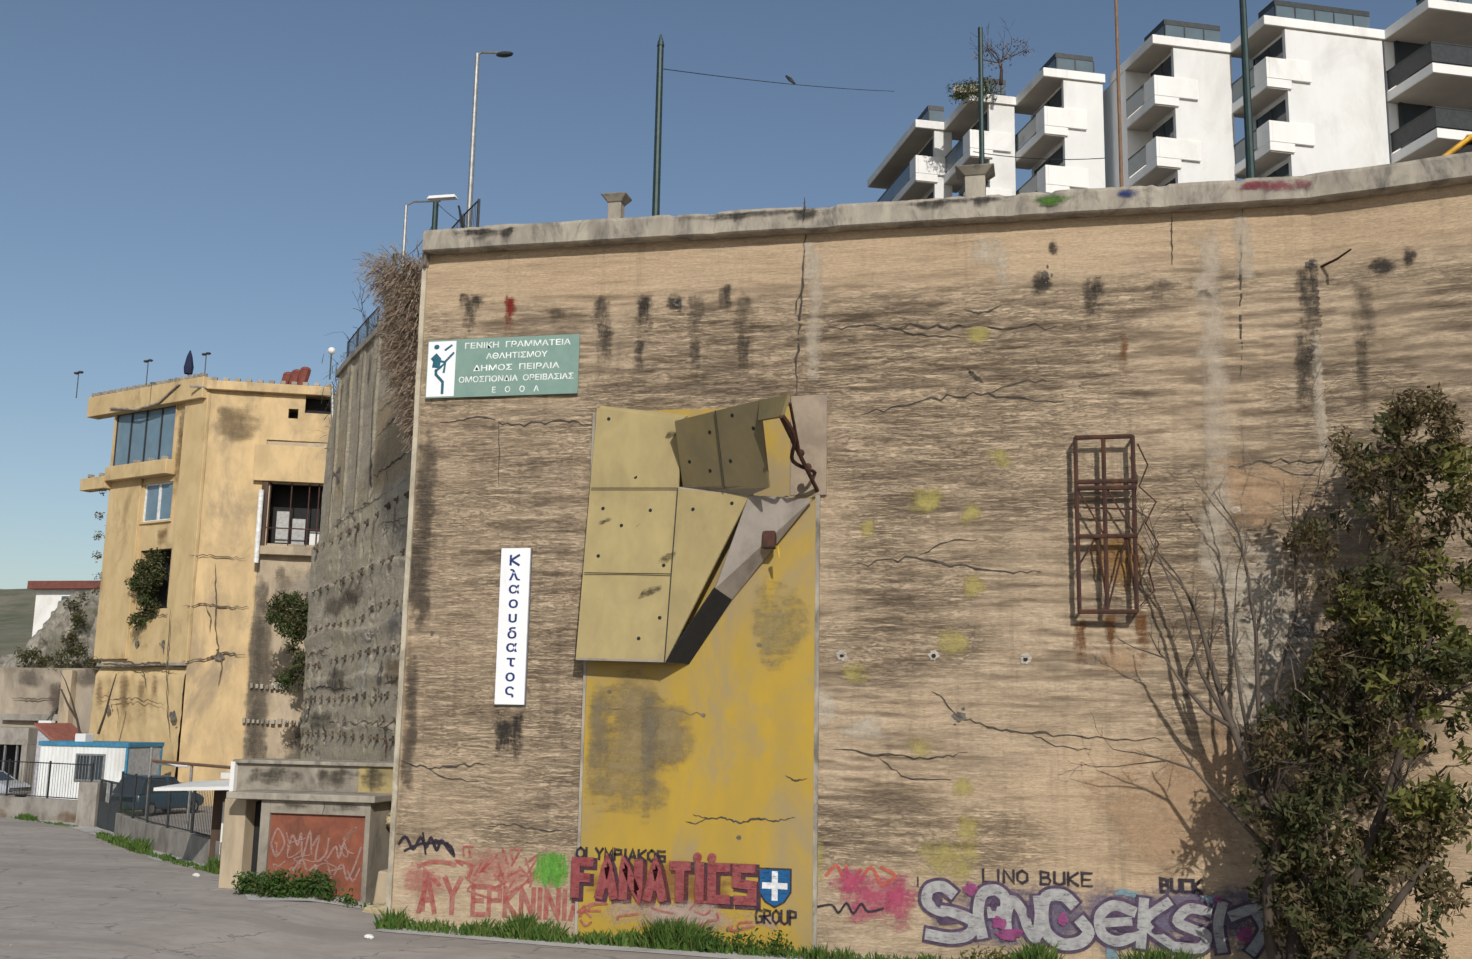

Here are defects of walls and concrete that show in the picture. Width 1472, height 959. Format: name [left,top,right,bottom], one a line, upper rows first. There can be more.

damp [460,294,481,322]
damp [595,298,613,351]
damp [636,297,682,363]
crack [795,197,1061,415]
damp [1295,263,1329,466]
rust [1094,538,1140,580]
damp [1176,239,1315,811]
rust [1136,615,1147,656]
damp [244,582,330,783]
damp [591,680,689,804]
crack [834,691,1162,780]
crack [686,814,795,824]